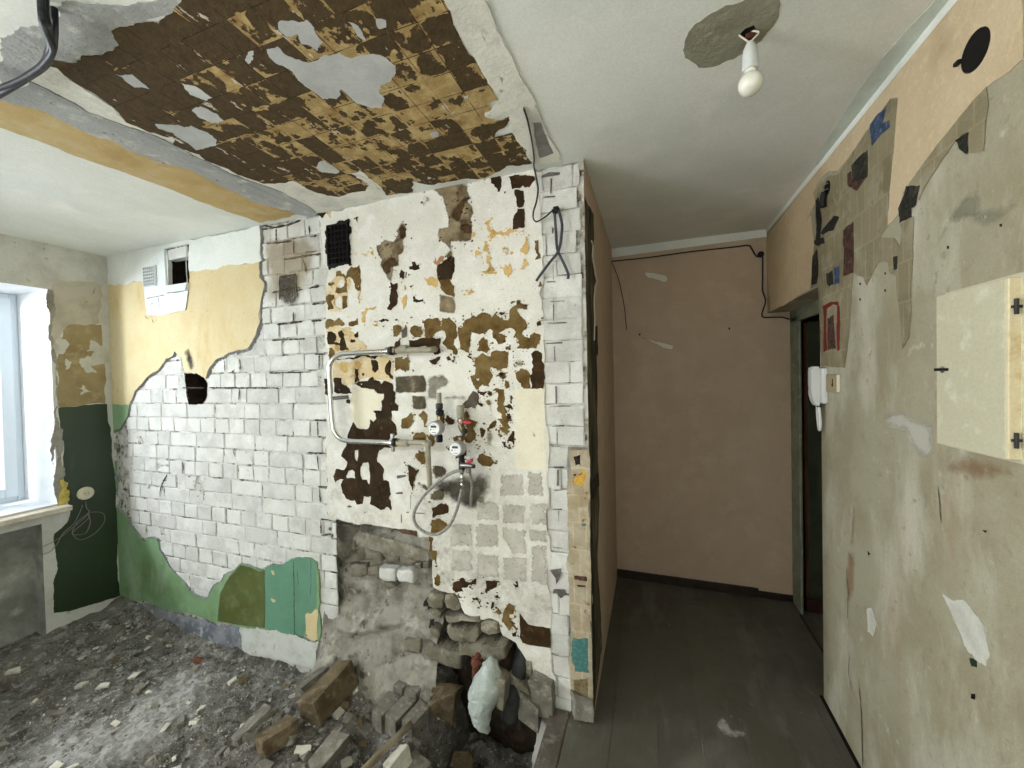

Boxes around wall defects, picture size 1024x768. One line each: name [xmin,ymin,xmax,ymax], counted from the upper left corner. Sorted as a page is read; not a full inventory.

spalling [116,74,149,89]
spalling [155,83,224,150]
spalling [267,20,396,108]
peeling [683,0,780,68]
peeling [439,279,455,313]
peeling [46,278,110,505]
flaking render [114,211,393,642]
peeling [401,411,449,533]
peeling [442,415,495,467]
flaking render [480,163,585,712]
spalling [422,574,537,754]
spalling [942,593,990,667]